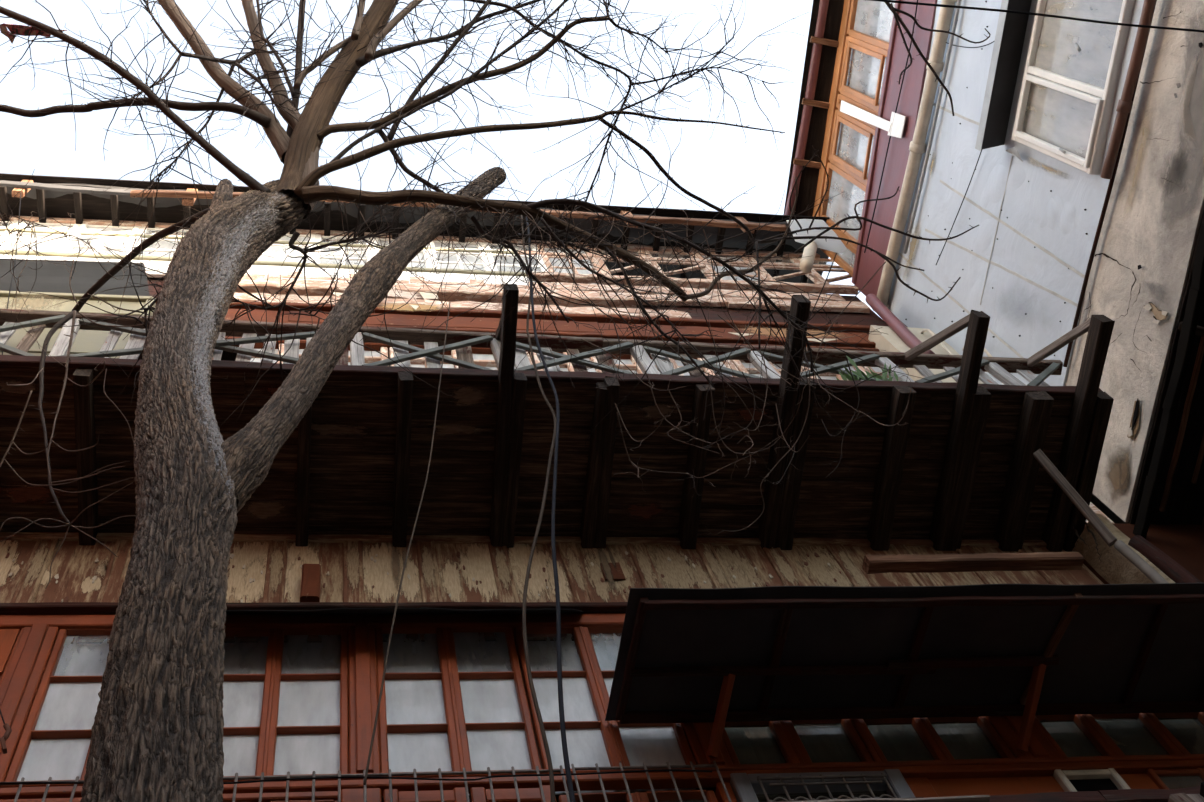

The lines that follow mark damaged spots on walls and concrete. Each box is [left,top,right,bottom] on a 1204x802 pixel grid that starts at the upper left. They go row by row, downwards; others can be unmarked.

damp [1162,16,1204,223]
crack [1083,253,1151,370]
peeling [0,540,59,588]
peeling [81,556,109,593]
peeling [226,542,330,603]
peeling [346,542,868,602]